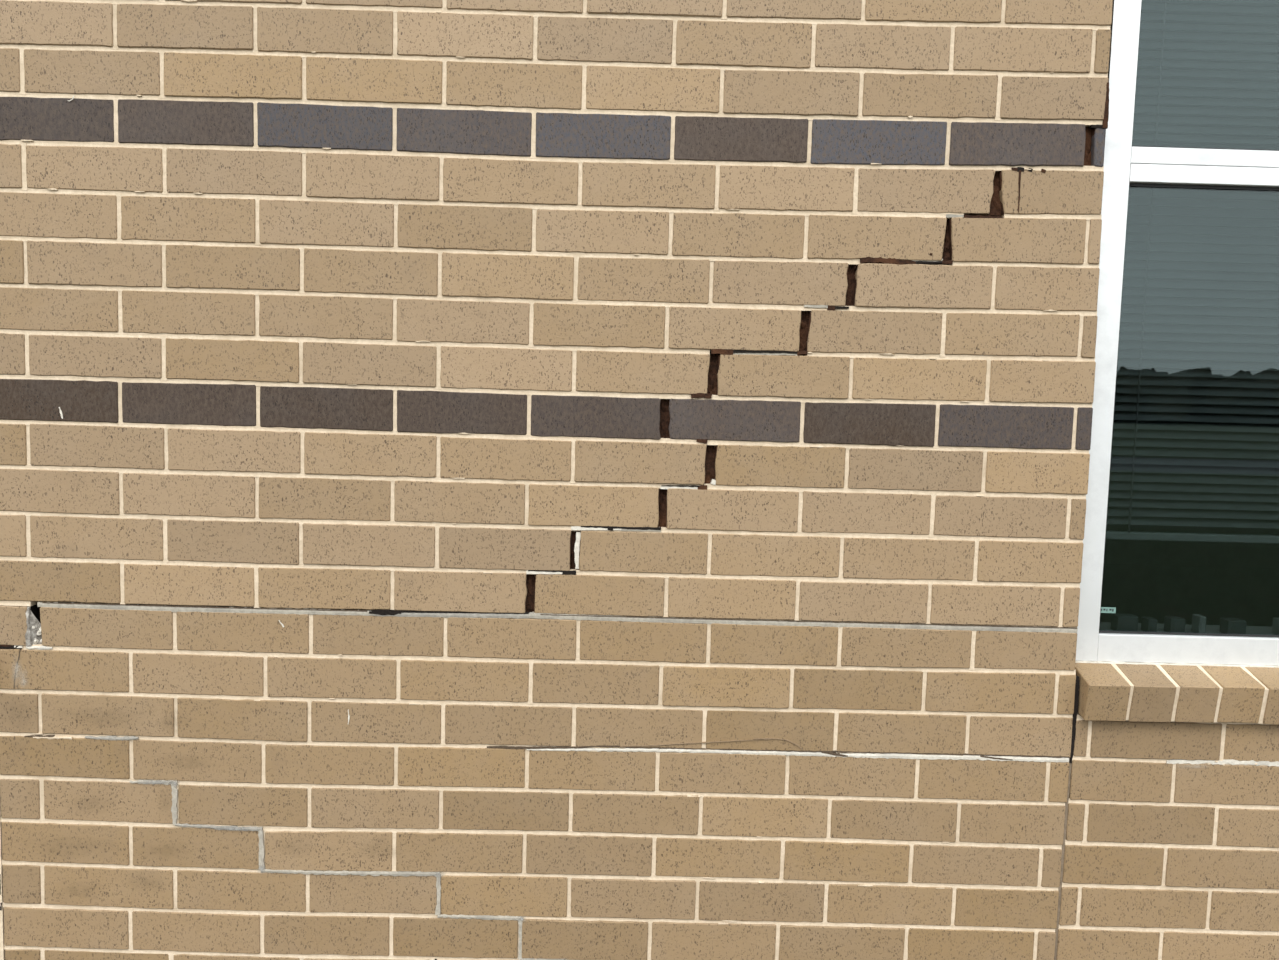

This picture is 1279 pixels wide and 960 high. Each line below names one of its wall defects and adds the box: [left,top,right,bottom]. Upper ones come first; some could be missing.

crack [1084,82,1109,166]
crack [42,167,1077,629]
crack [487,675,1079,763]